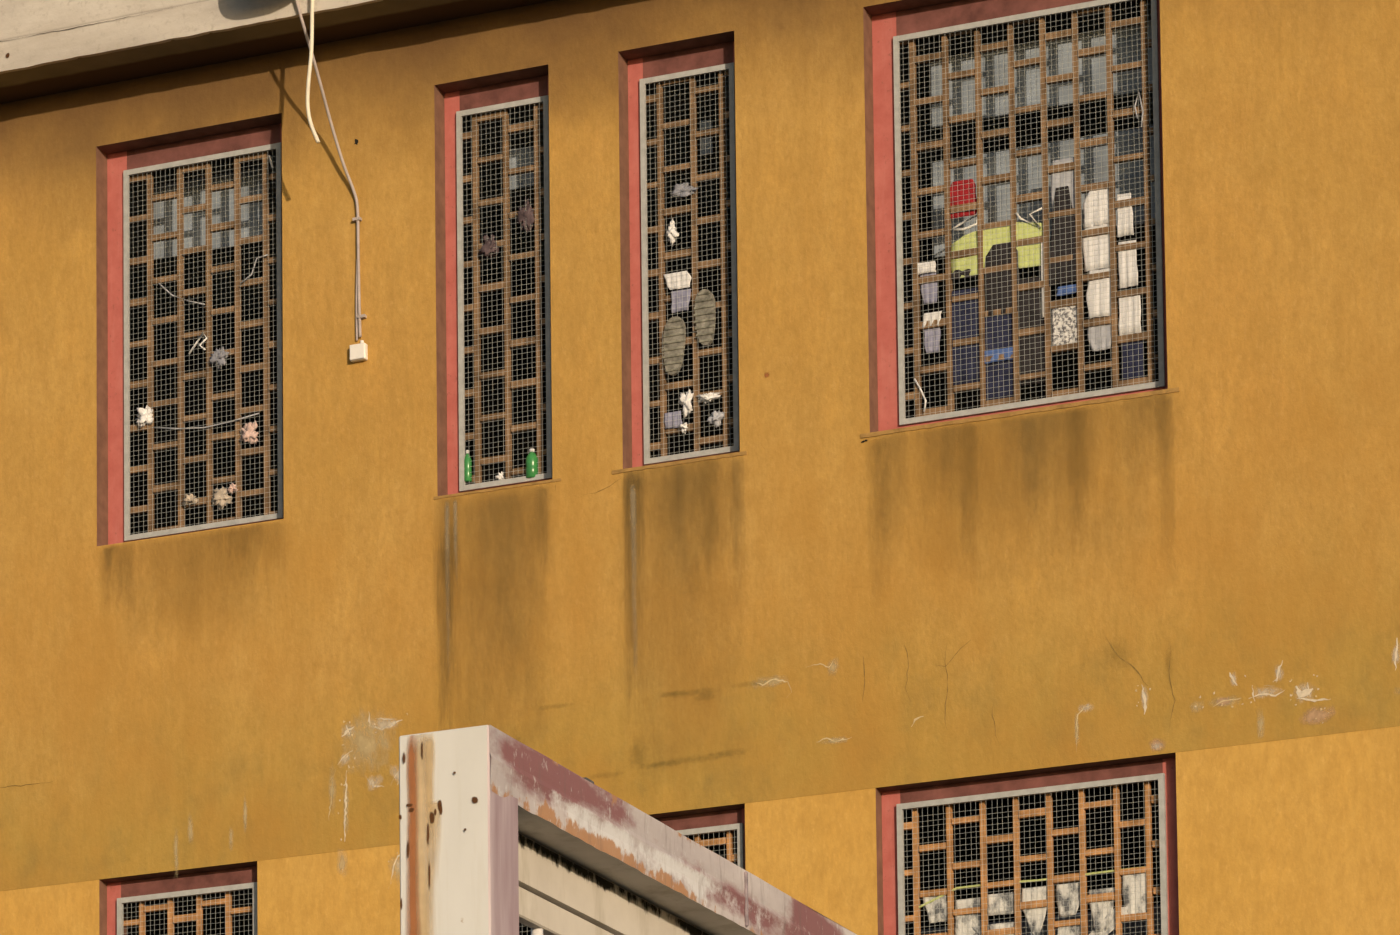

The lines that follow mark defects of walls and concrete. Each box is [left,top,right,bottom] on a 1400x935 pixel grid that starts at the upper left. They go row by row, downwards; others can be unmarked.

peeling [1194,660,1330,723]
peeling [328,713,408,874]